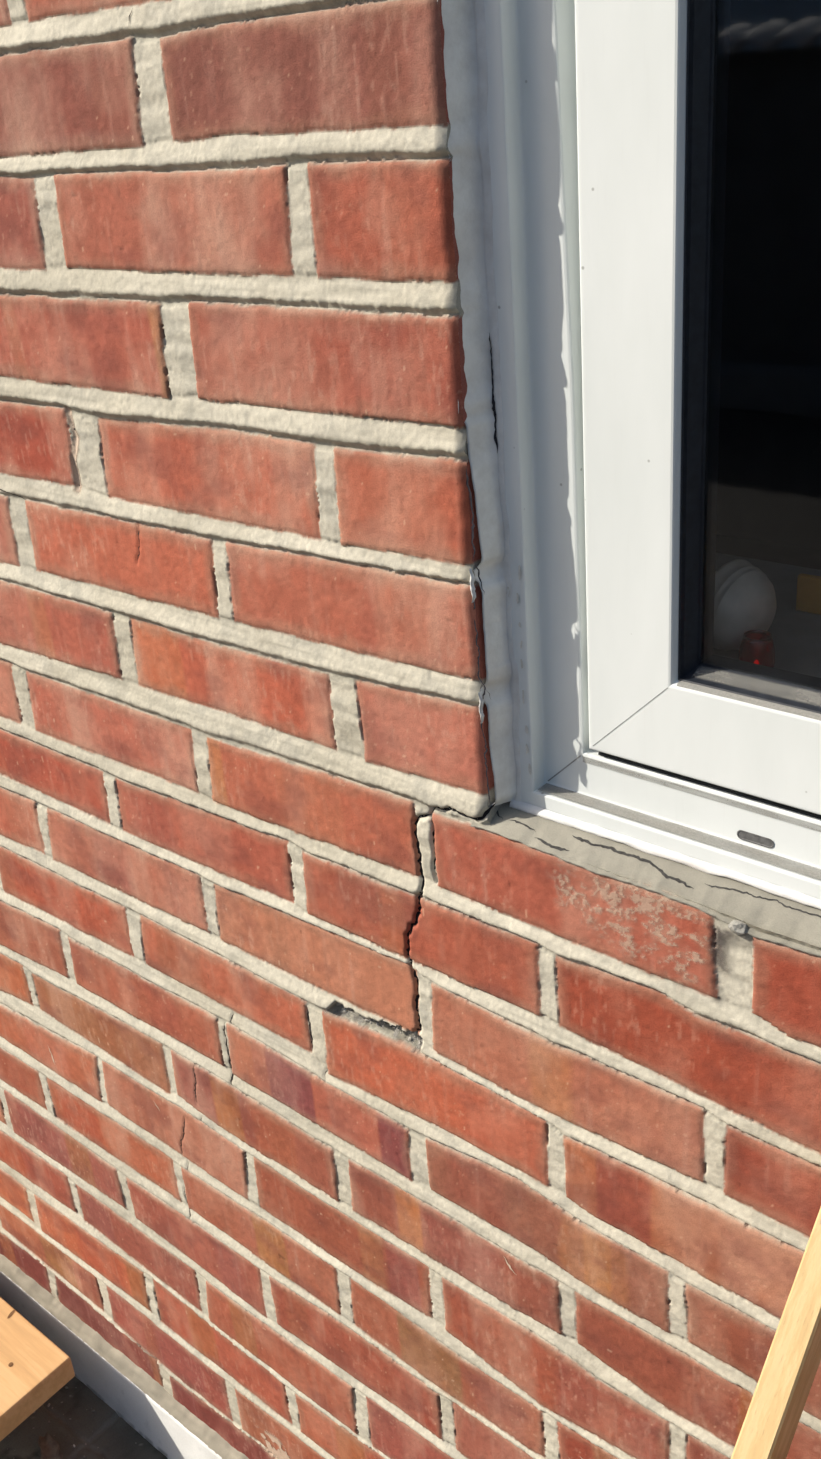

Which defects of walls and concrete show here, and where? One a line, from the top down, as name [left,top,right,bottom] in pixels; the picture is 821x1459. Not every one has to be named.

spalling [326,1002,423,1048]
crack [406,803,821,1030]